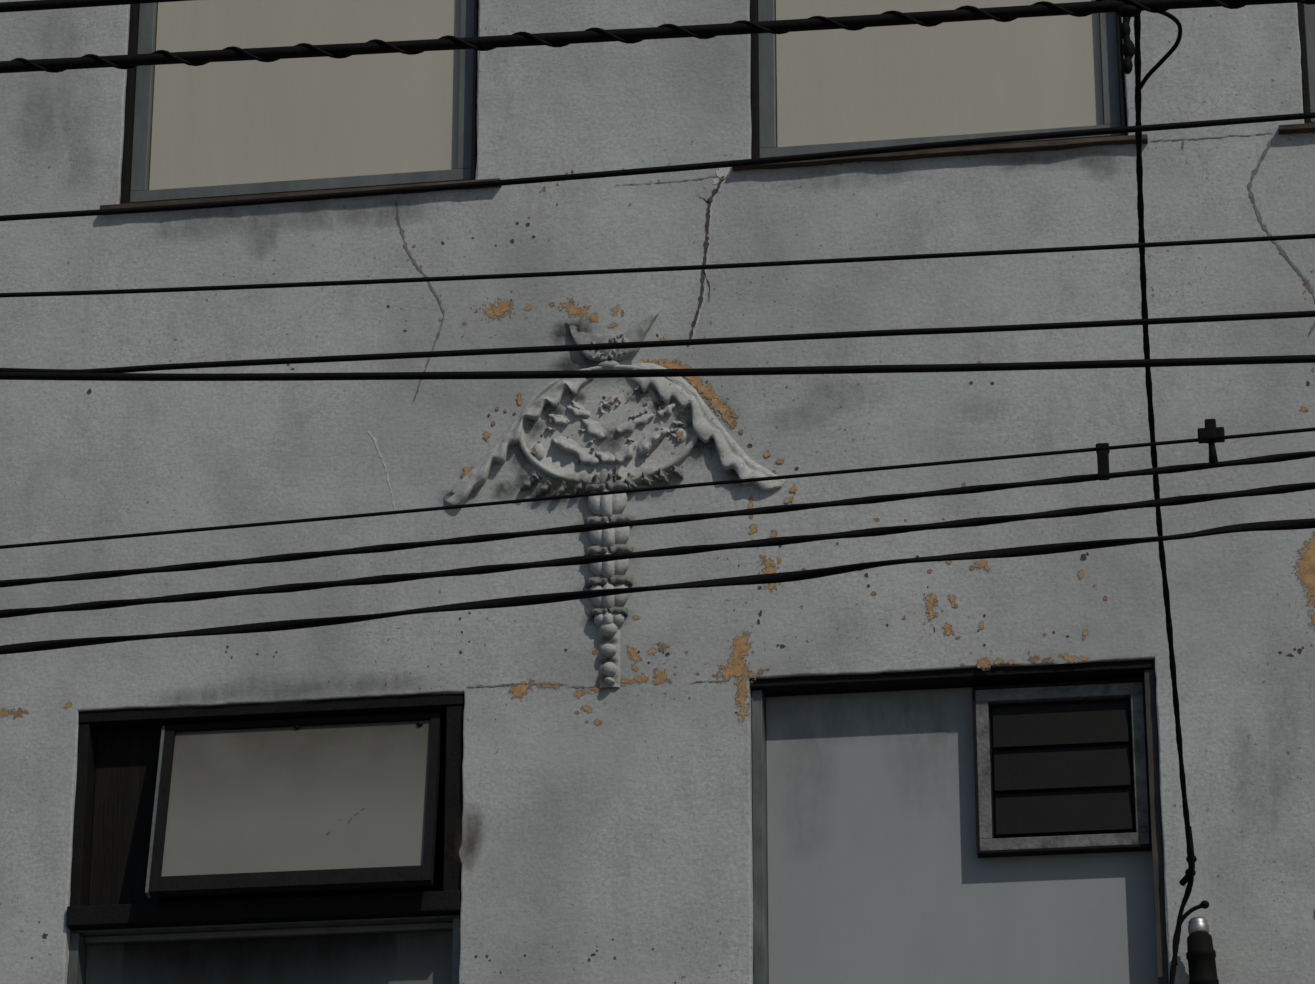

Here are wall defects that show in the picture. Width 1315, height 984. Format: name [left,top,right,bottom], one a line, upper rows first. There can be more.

crack [395,202,445,402]
peeling [462,290,533,326]
peeling [549,296,625,329]
crack [615,176,727,347]
crack [1152,133,1315,336]
peeling [630,357,799,503]
peeling [0,707,29,719]
peeling [506,642,688,725]
peeling [696,610,771,722]
peeling [969,559,990,571]
peeling [886,569,1089,670]
peeling [1291,530,1315,631]